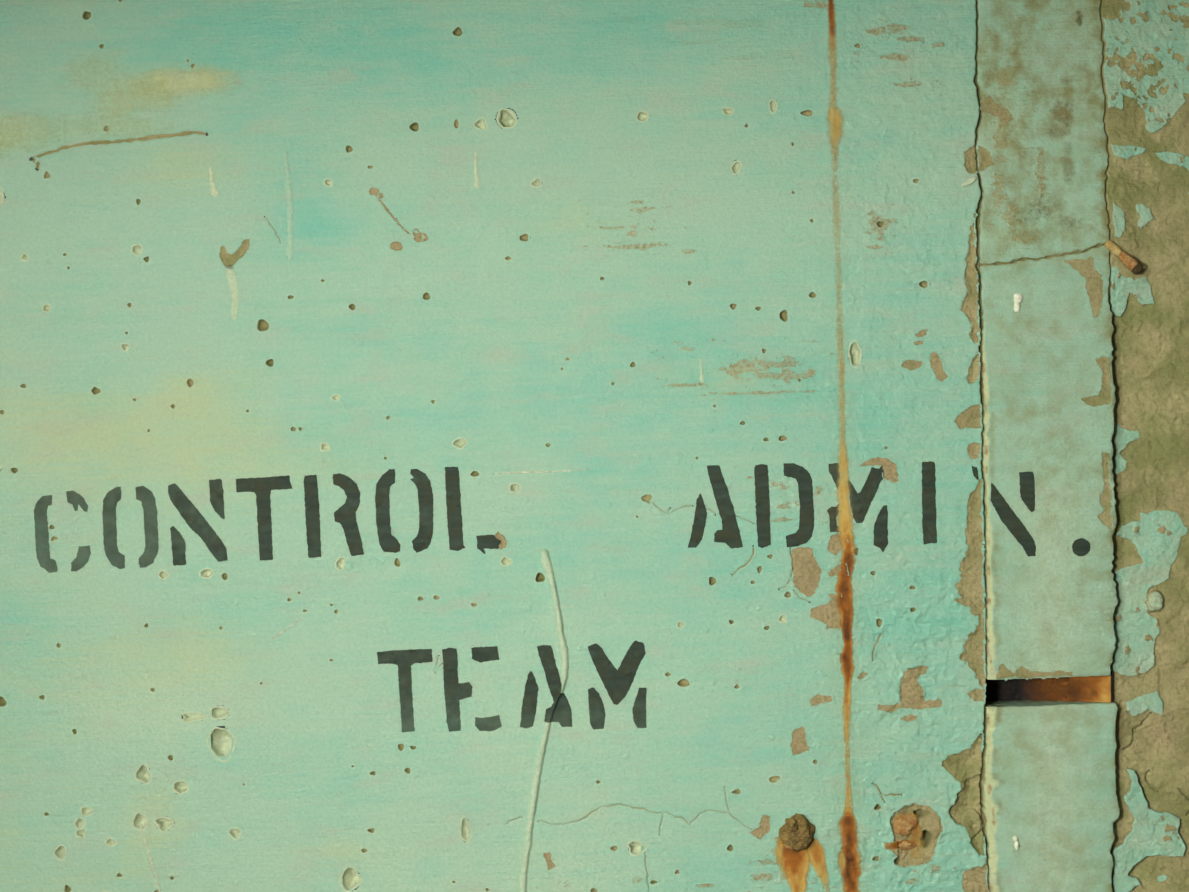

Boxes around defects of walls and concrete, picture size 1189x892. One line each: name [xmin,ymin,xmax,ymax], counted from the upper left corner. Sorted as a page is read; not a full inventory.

rust [828,0,836,70]
rust [828,91,842,151]
peeling [1103,0,1189,133]
peeling [1112,202,1153,237]
crack [973,0,1111,675]
peeling [1064,256,1154,319]
rust [776,364,861,892]
spalling [953,478,1075,703]
peeling [1097,423,1188,676]
rust [885,813,920,849]
crack [978,706,989,889]
peeling [1111,768,1186,892]